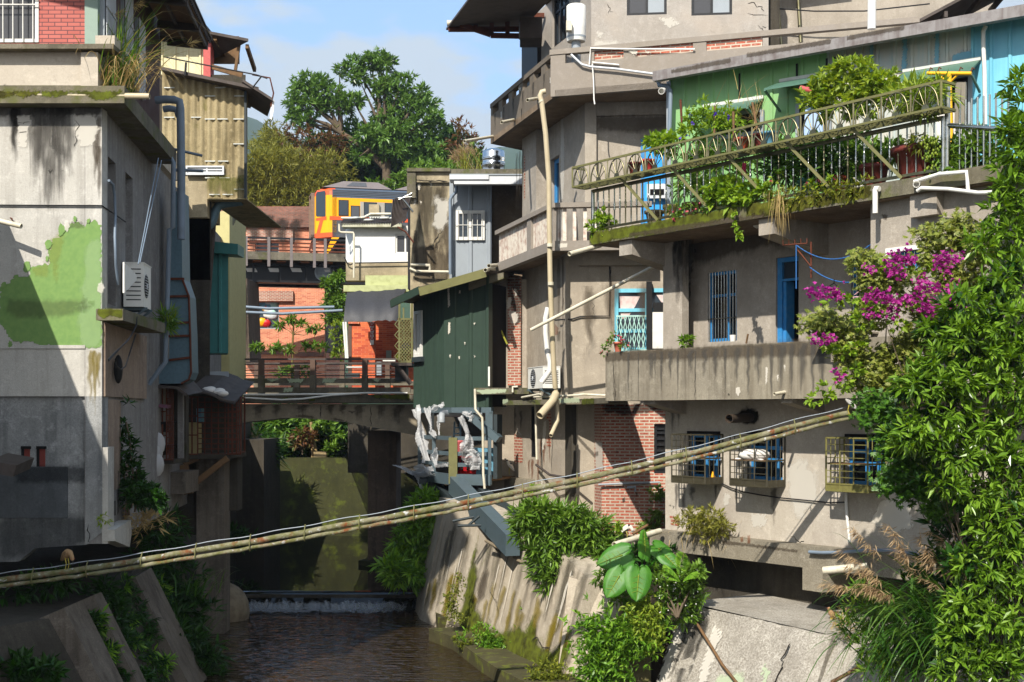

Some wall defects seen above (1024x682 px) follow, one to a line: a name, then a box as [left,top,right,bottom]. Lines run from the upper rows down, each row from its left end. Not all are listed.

water stain [0,108,101,186]
water stain [629,214,780,298]
water stain [89,351,100,395]
water stain [426,546,462,616]
water stain [472,558,571,650]